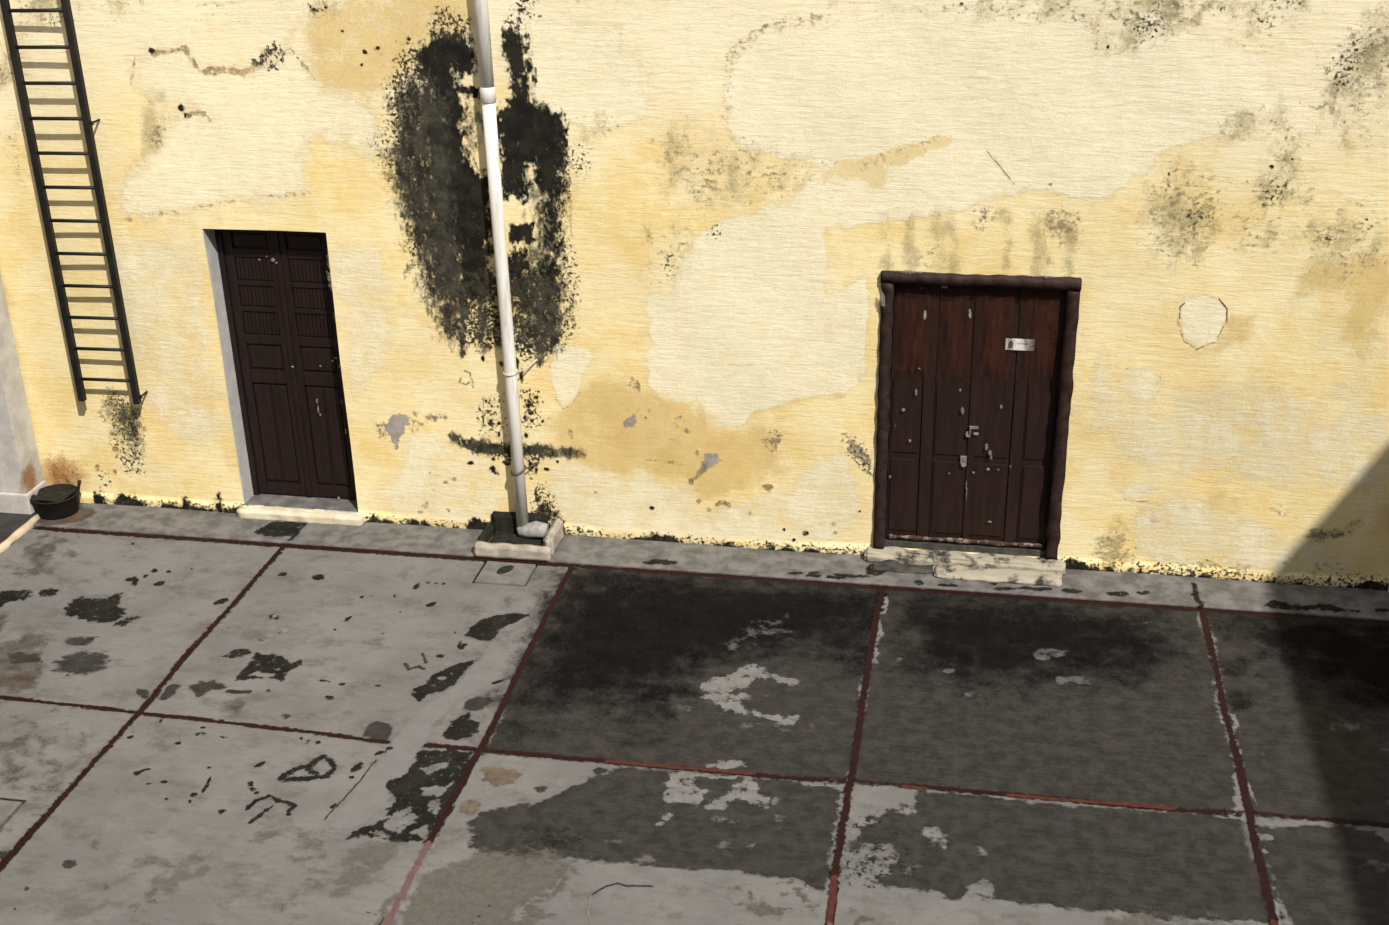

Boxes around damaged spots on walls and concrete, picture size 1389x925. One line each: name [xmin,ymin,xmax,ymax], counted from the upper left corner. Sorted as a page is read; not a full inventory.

water stain [277,0,502,388]
flaking render [1176,293,1229,350]
water stain [107,393,148,446]
water stain [92,488,253,514]
flaking render [368,410,506,525]
flaking render [547,449,863,545]
water stain [346,0,1389,925]
water stain [0,568,171,681]
water stain [245,721,394,824]